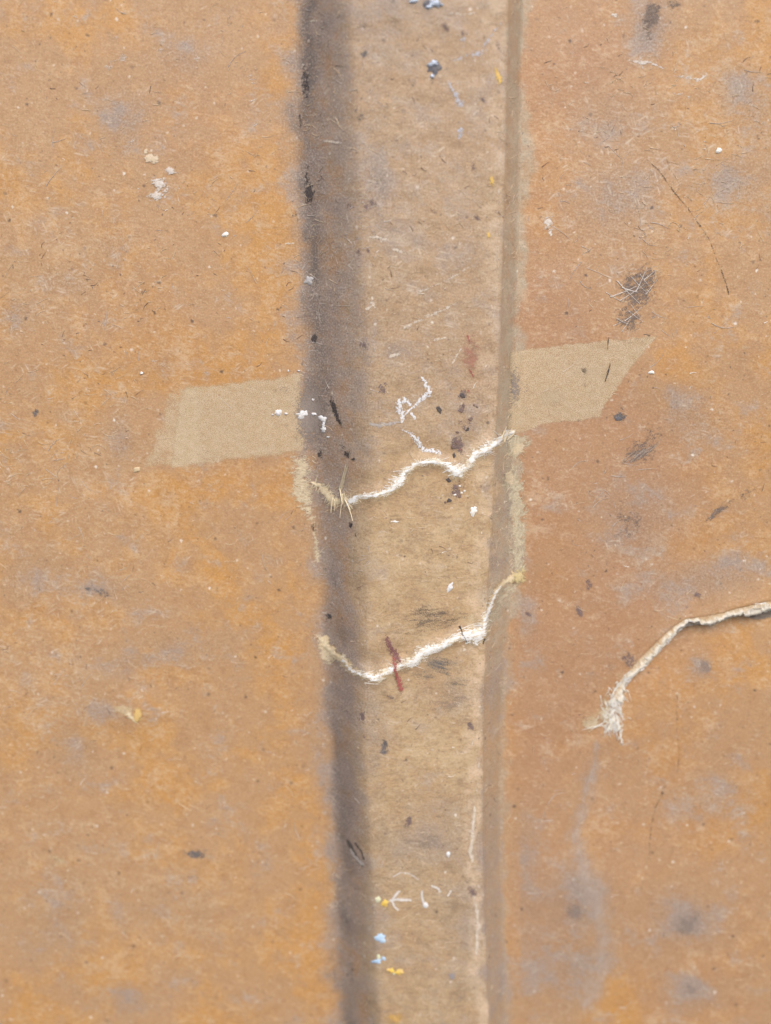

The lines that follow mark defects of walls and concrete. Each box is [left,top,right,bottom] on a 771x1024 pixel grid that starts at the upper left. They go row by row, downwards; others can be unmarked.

crack [309,426,516,521]
crack [313,568,526,690]
crack [579,598,771,745]